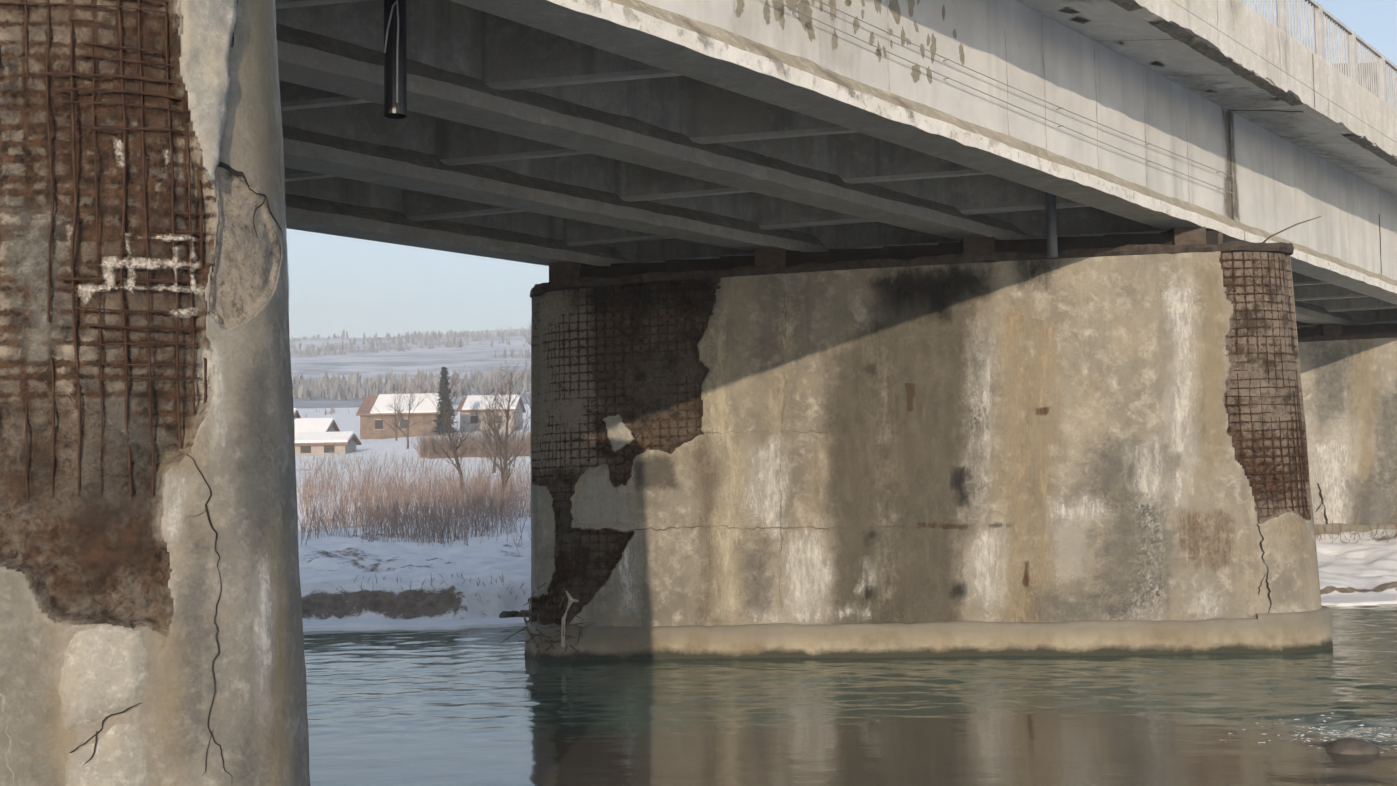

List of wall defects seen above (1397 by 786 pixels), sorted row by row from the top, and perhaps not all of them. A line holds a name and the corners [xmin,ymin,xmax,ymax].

crack [69,702,143,767]
spalling [0,0,282,637]
crack [182,454,233,779]
crack [217,162,285,252]
spalling [531,278,721,627]
water stain [619,546,637,611]
water stain [706,269,1005,624]
water stain [1037,287,1196,622]
crack [1257,524,1272,613]
spalling [1219,251,1311,524]